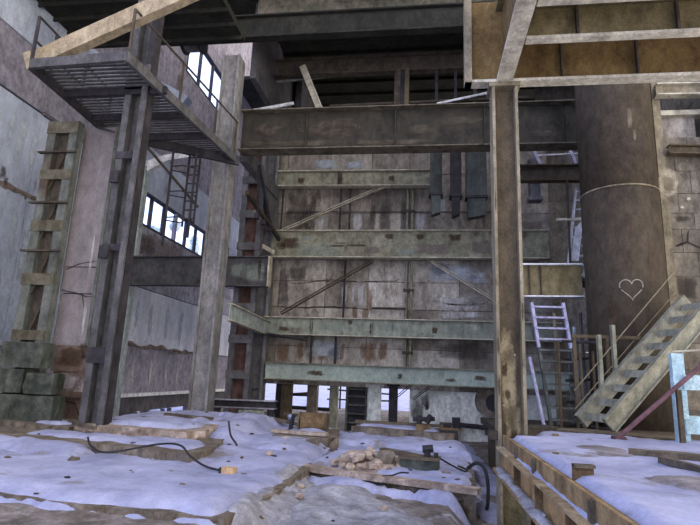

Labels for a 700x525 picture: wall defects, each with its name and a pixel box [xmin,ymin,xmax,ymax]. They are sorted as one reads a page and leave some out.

rust [360,344,386,361]